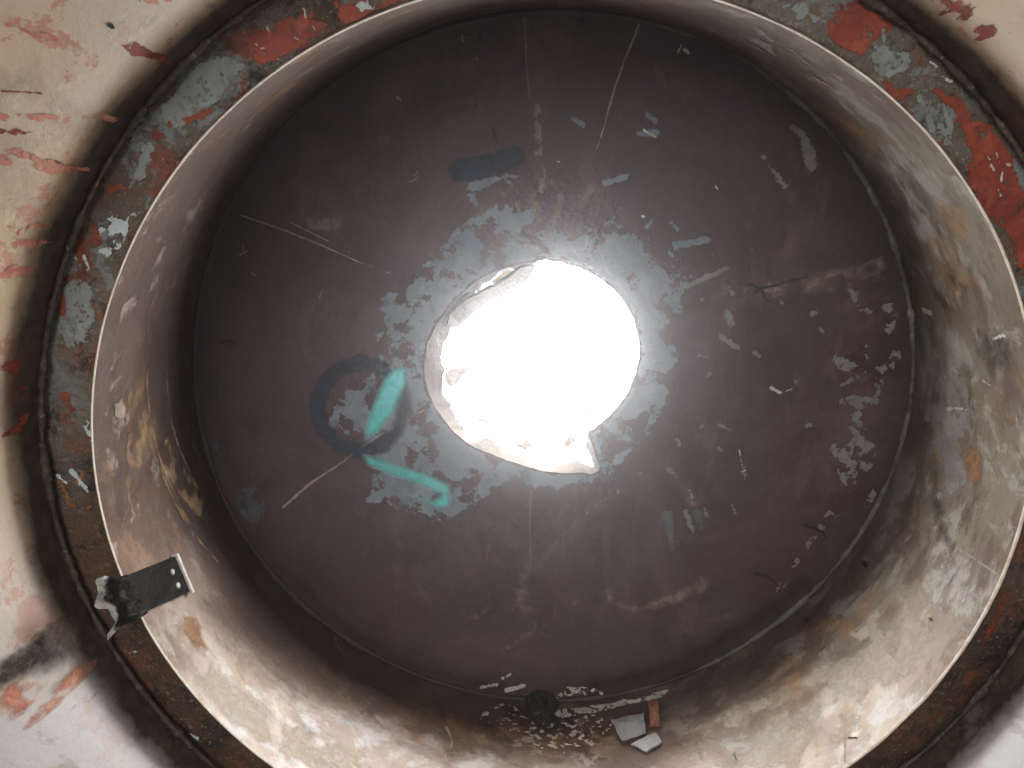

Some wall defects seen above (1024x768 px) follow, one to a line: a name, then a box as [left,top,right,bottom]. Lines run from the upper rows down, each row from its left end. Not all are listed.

peeling [122,42,170,64]
peeling [158,0,404,132]
peeling [781,0,911,80]
peeling [937,0,997,43]
peeling [916,61,1024,275]
peeling [98,211,140,257]
peeling [56,254,96,347]
crack [748,276,809,303]
peeling [328,173,729,535]
peeling [828,344,901,492]
corrosion [185,617,207,648]
peeling [479,673,668,753]